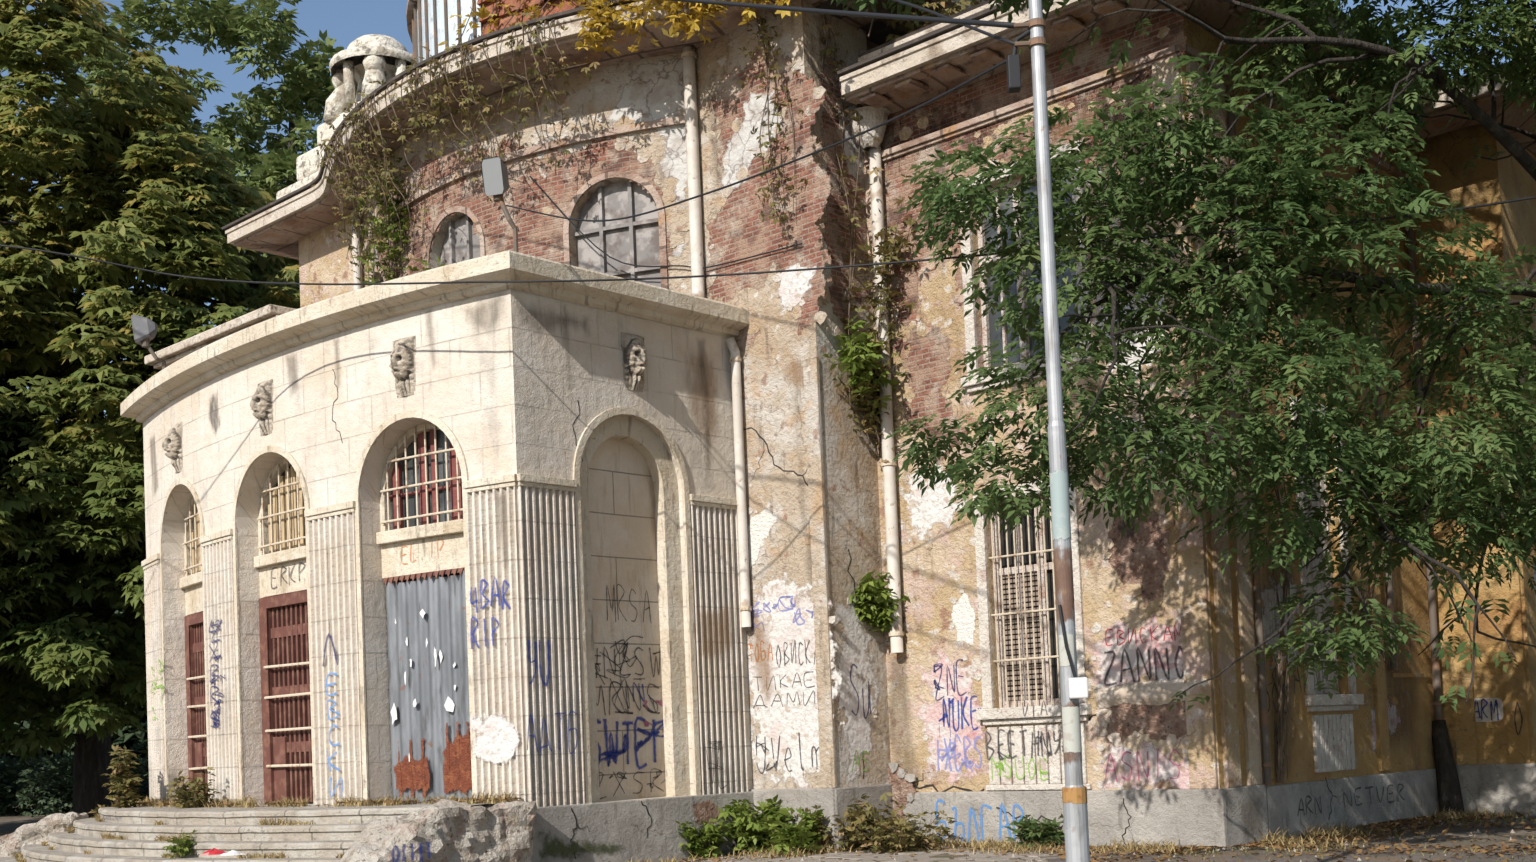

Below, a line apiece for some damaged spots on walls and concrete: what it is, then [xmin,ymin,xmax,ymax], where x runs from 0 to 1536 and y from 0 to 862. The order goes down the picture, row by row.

spalling [376,4,1187,550]
crack [743,427,808,486]
corrosion [394,722,472,798]
peeling [746,507,880,788]
peeling [888,589,988,832]
spalling [1087,506,1190,790]